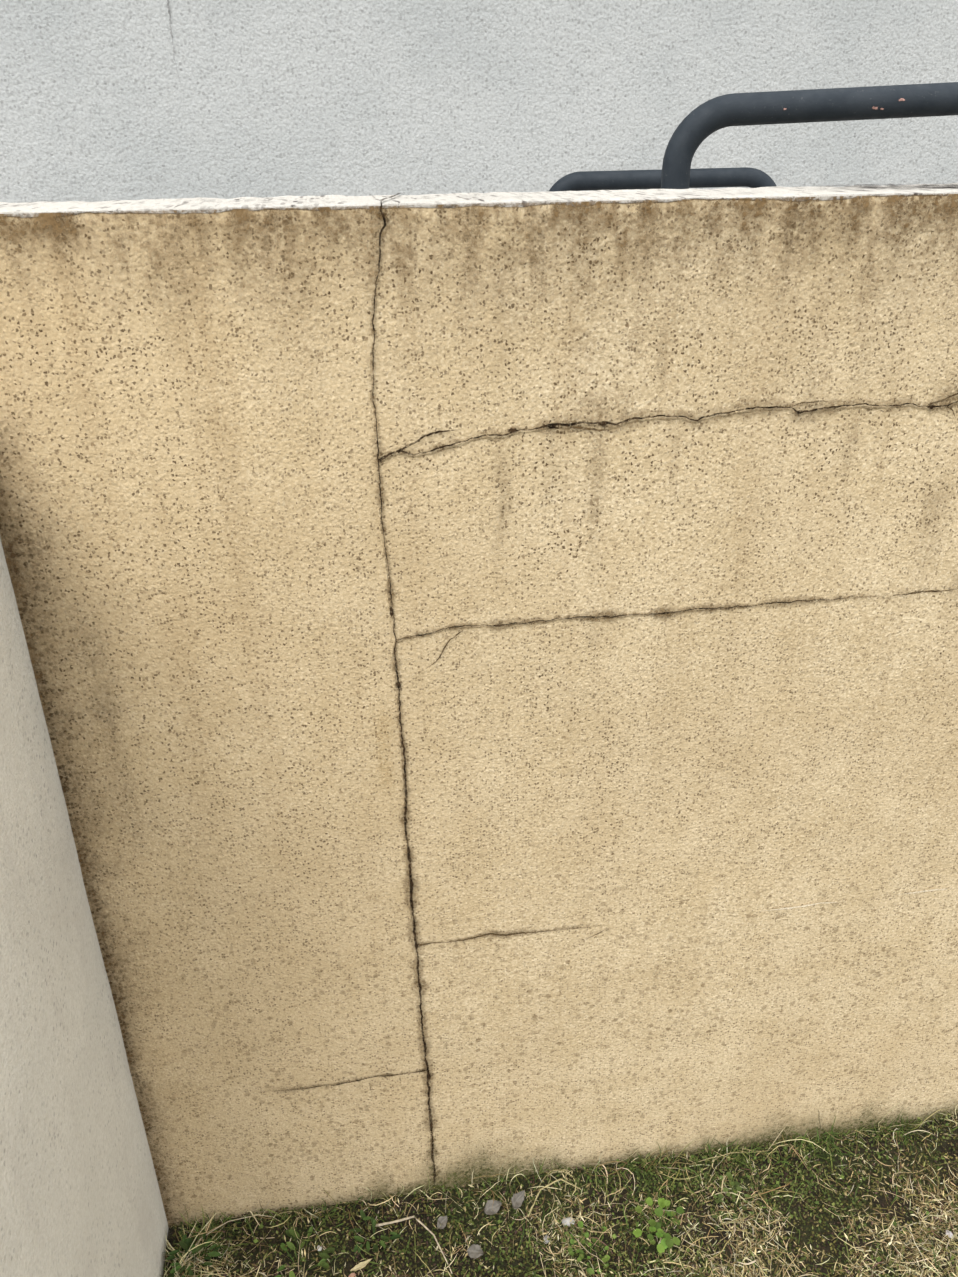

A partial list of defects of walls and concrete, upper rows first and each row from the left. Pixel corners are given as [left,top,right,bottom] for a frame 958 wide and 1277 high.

damp [0,194,958,268]
crack [300,193,958,1190]